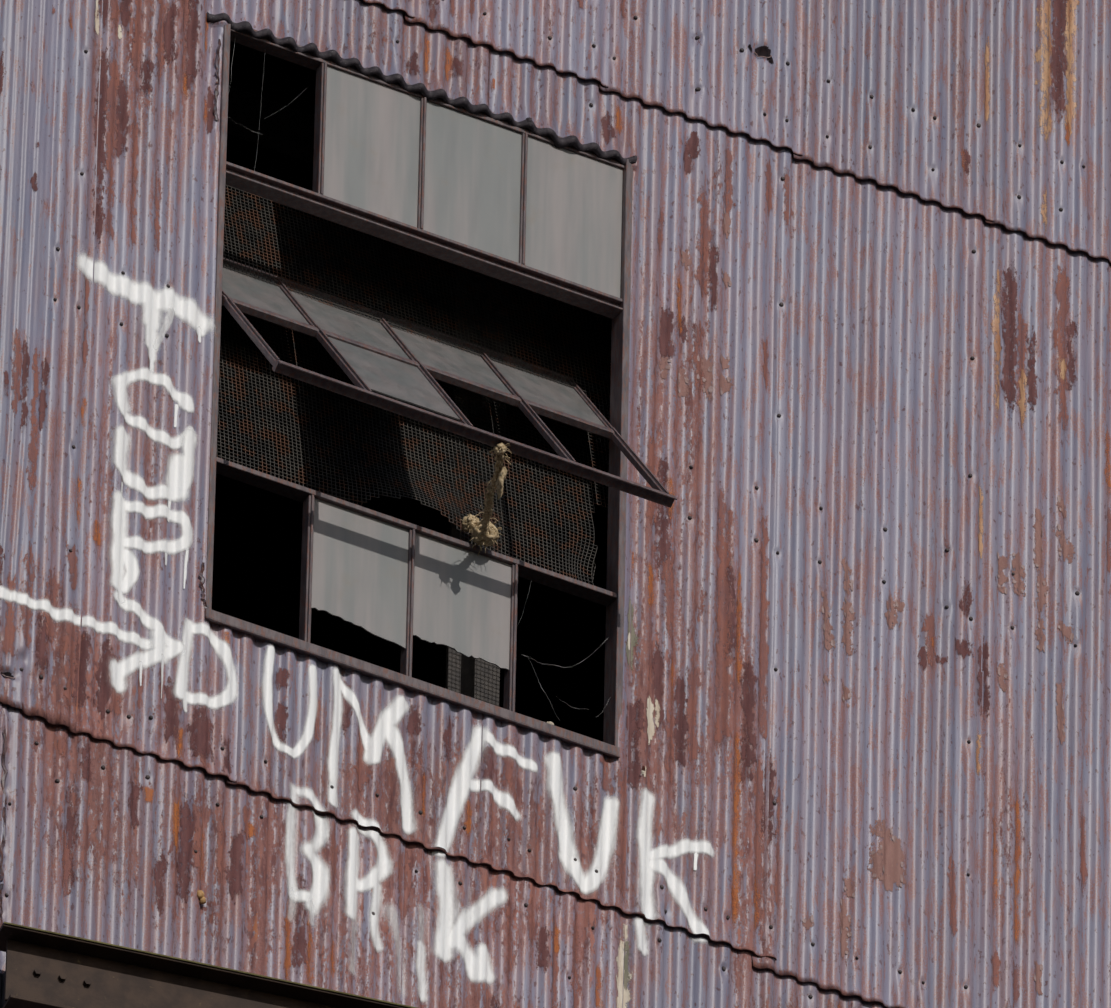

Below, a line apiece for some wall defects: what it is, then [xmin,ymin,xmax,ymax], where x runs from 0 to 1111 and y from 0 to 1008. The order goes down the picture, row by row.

rust [694,144,735,312]
rust [990,260,1038,428]
rust [1051,265,1077,431]
peeling [997,495,1079,652]
rust [163,676,232,774]
rust [154,795,255,917]
rust [274,668,290,744]
rust [341,681,373,791]
rust [600,702,642,901]
rust [646,433,783,930]
peeling [867,820,911,898]
peeling [1055,682,1067,745]